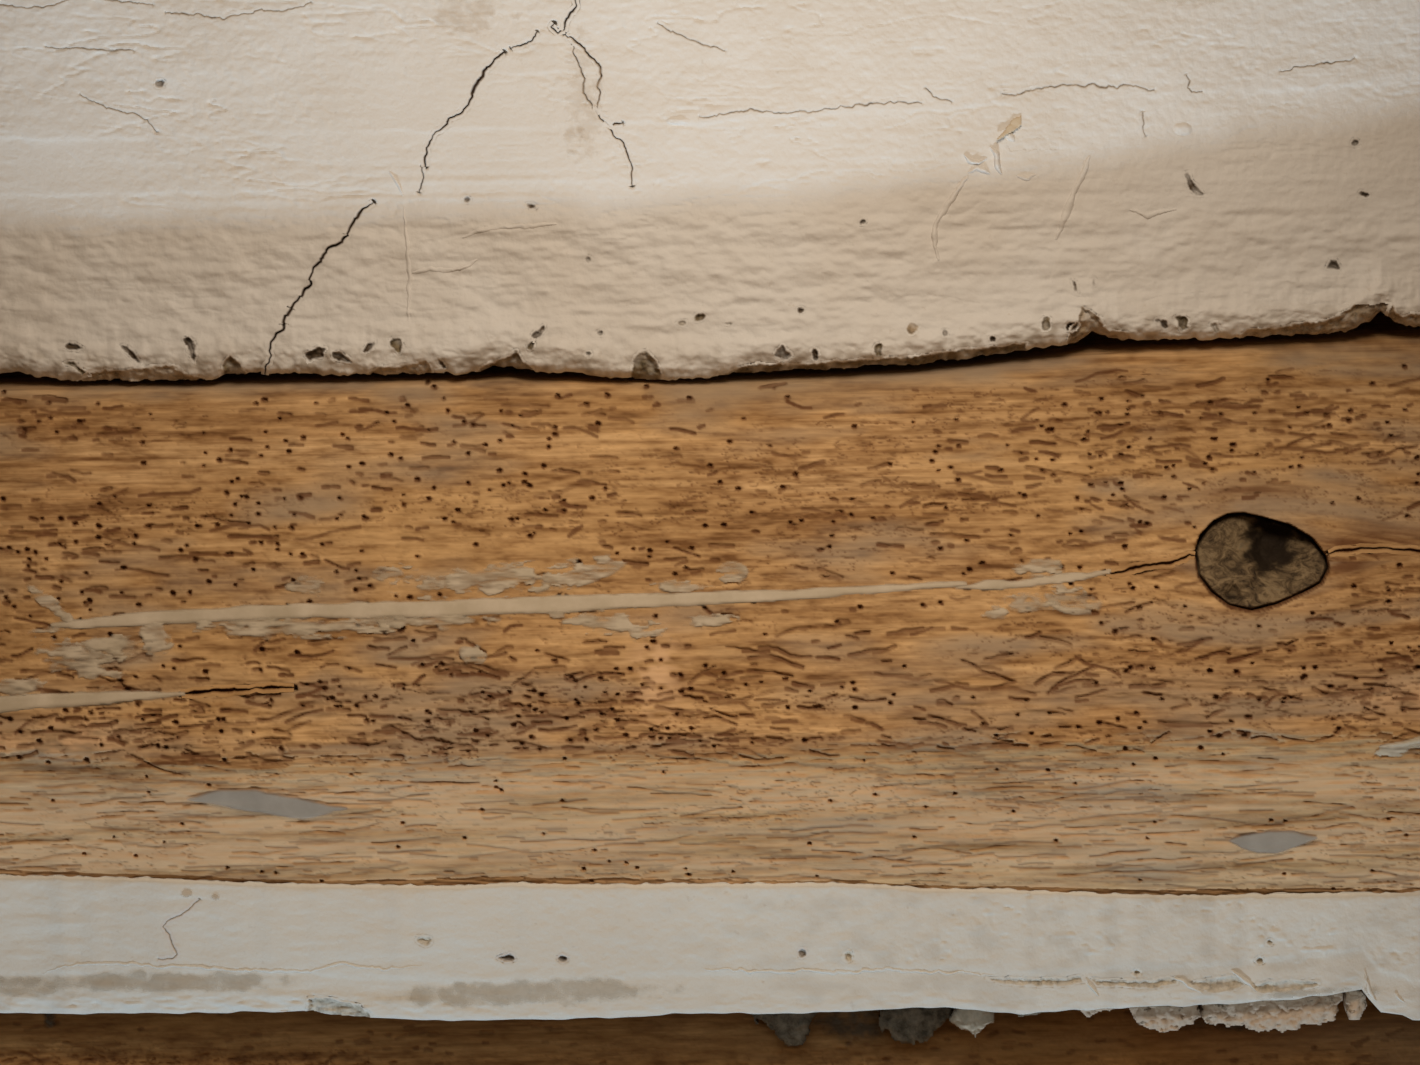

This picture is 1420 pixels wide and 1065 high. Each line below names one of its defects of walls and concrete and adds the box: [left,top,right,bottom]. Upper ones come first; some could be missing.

crack [656,20,726,55]
crack [415,0,636,193]
crack [261,200,376,375]
spalling [60,335,249,381]
spalling [303,334,447,375]
spalling [475,321,547,372]
spalling [583,328,605,359]
spalling [628,347,665,380]
spalling [675,310,735,328]
spalling [714,278,1133,376]
spalling [1153,312,1191,333]
spalling [1237,302,1420,338]